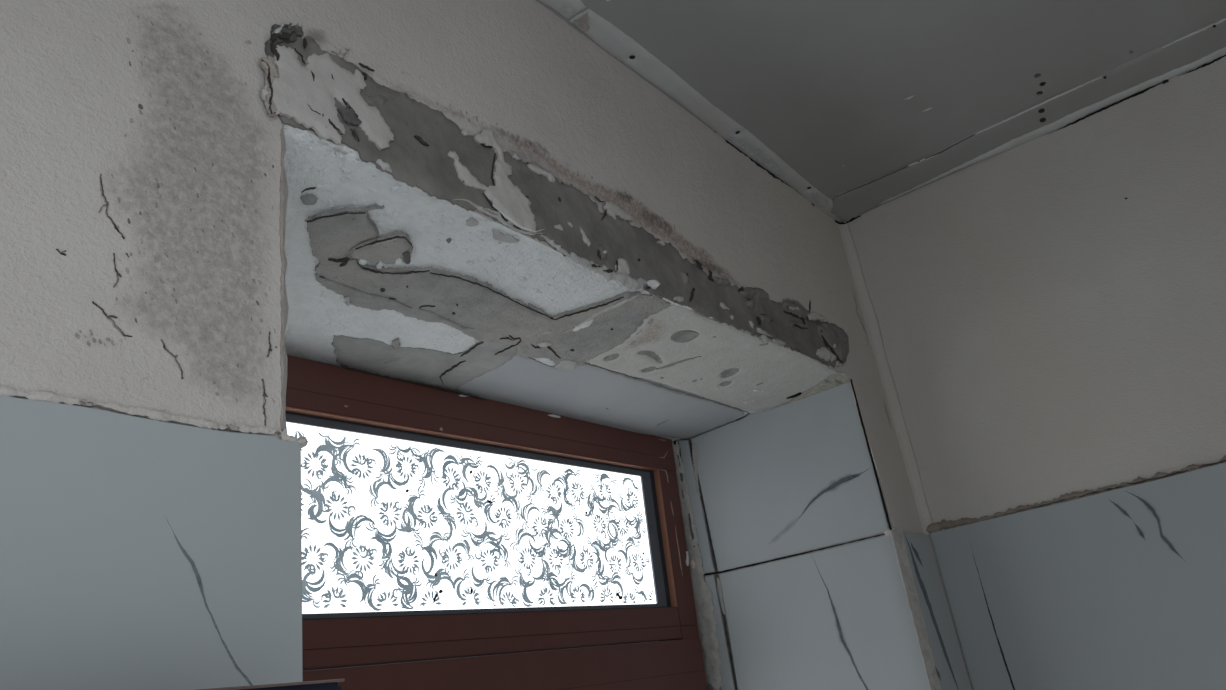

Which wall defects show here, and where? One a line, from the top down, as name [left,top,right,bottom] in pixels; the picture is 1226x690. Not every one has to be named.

crack [92,174,183,379]
damp [117,38,228,229]
peeling [245,22,849,429]